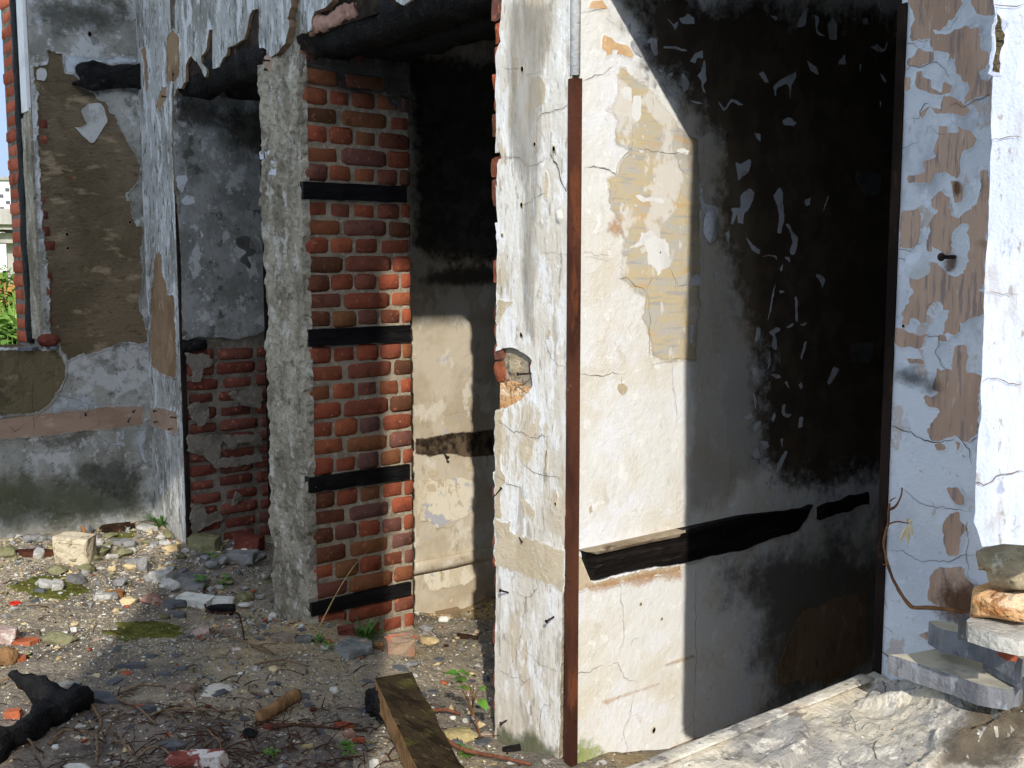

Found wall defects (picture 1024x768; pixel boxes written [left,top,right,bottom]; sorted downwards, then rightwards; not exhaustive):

peeling [587,0,609,12]
spalling [491,0,502,138]
spalling [491,156,501,207]
crack [508,104,568,205]
peeling [600,23,719,361]
peeling [726,159,754,243]
peeling [894,0,1009,460]
flaking render [0,48,269,540]
peeling [492,260,565,594]
crack [894,426,1018,486]
crack [893,490,975,575]
peeling [925,483,977,607]